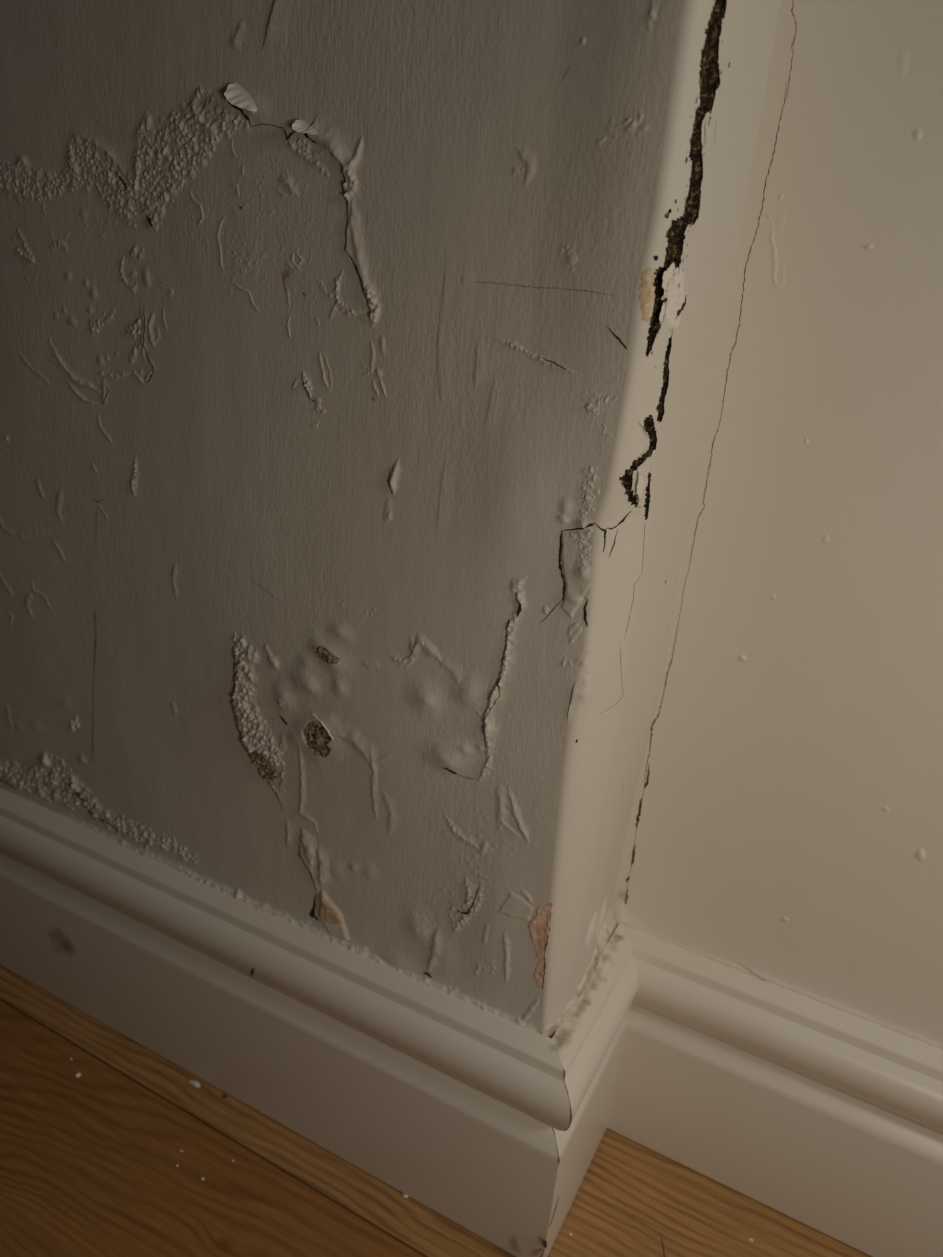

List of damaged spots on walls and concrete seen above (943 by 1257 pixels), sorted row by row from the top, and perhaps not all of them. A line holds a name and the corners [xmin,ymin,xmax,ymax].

peeling [223,78,387,401]
peeling [17,301,161,407]
crack [542,0,726,714]
crack [625,0,797,905]
flaking render [542,458,601,668]
flaking render [312,646,339,664]
peeling [0,748,201,866]
flaking render [249,751,283,790]
flaking render [302,721,332,757]
peeling [297,826,351,941]
flaking render [528,903,556,987]